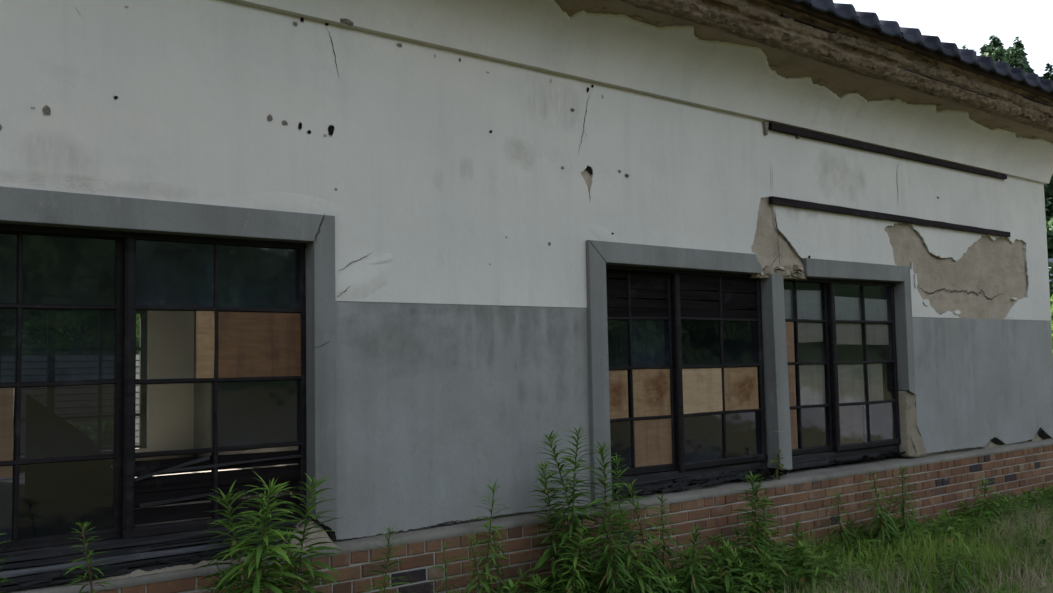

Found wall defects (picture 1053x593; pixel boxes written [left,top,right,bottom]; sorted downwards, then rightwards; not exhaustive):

spalling [555,0,1053,143]
spalling [580,166,593,198]
spalling [751,197,811,279]
spalling [884,223,1028,319]
spalling [982,438,1005,448]
spalling [1032,428,1052,441]
spalling [265,519,338,558]
spalling [87,557,249,584]